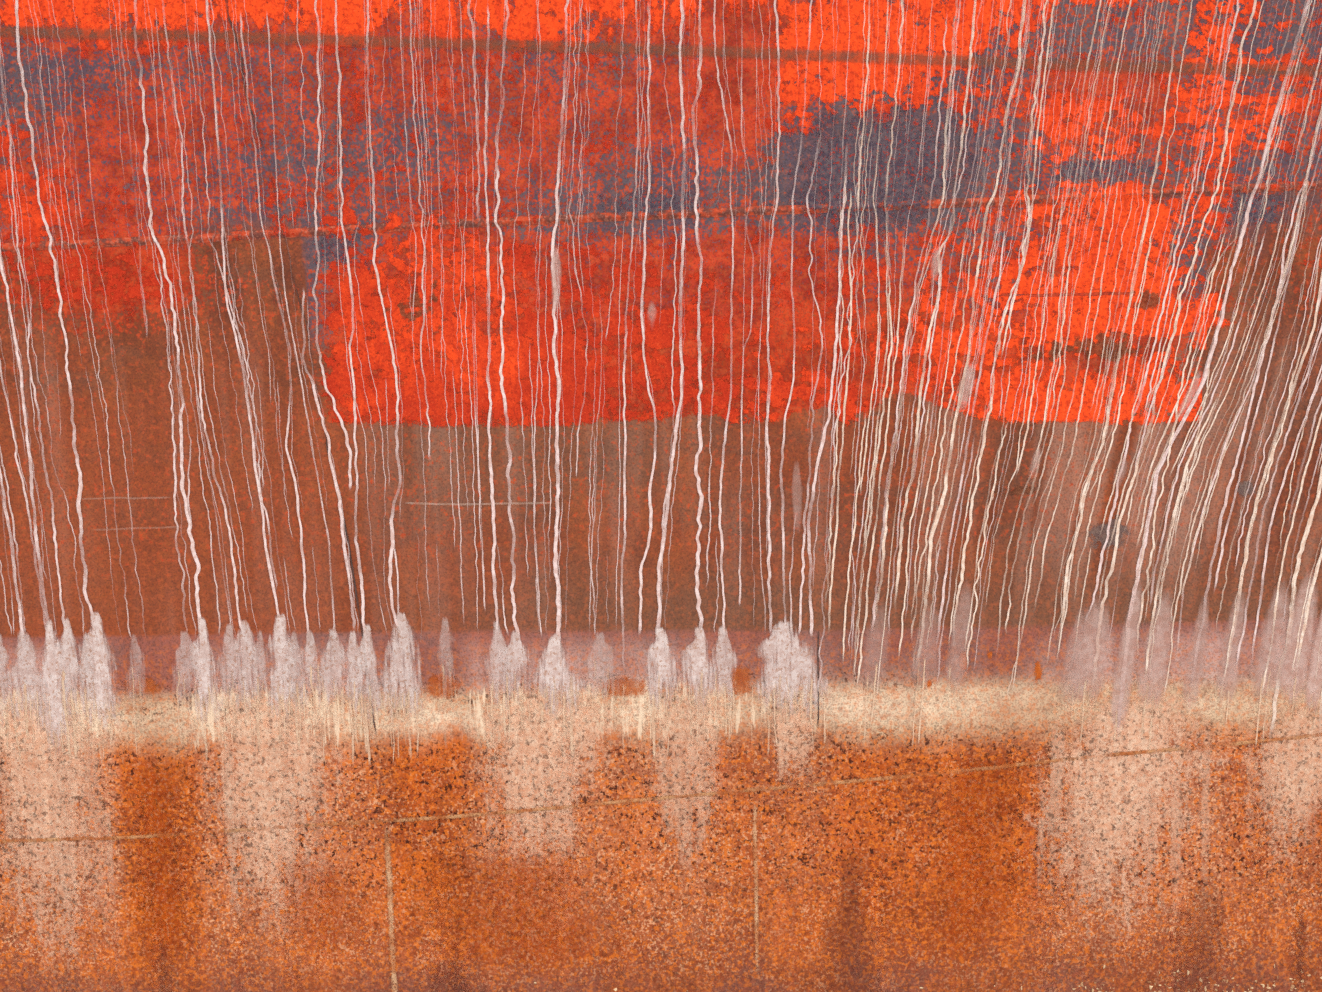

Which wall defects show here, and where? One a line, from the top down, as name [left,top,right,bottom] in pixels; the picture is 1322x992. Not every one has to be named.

damp [15,0,72,396]
damp [0,138,117,959]
damp [80,260,129,501]
damp [139,0,420,929]
damp [412,59,624,865]
damp [606,156,656,617]
damp [637,0,1322,936]